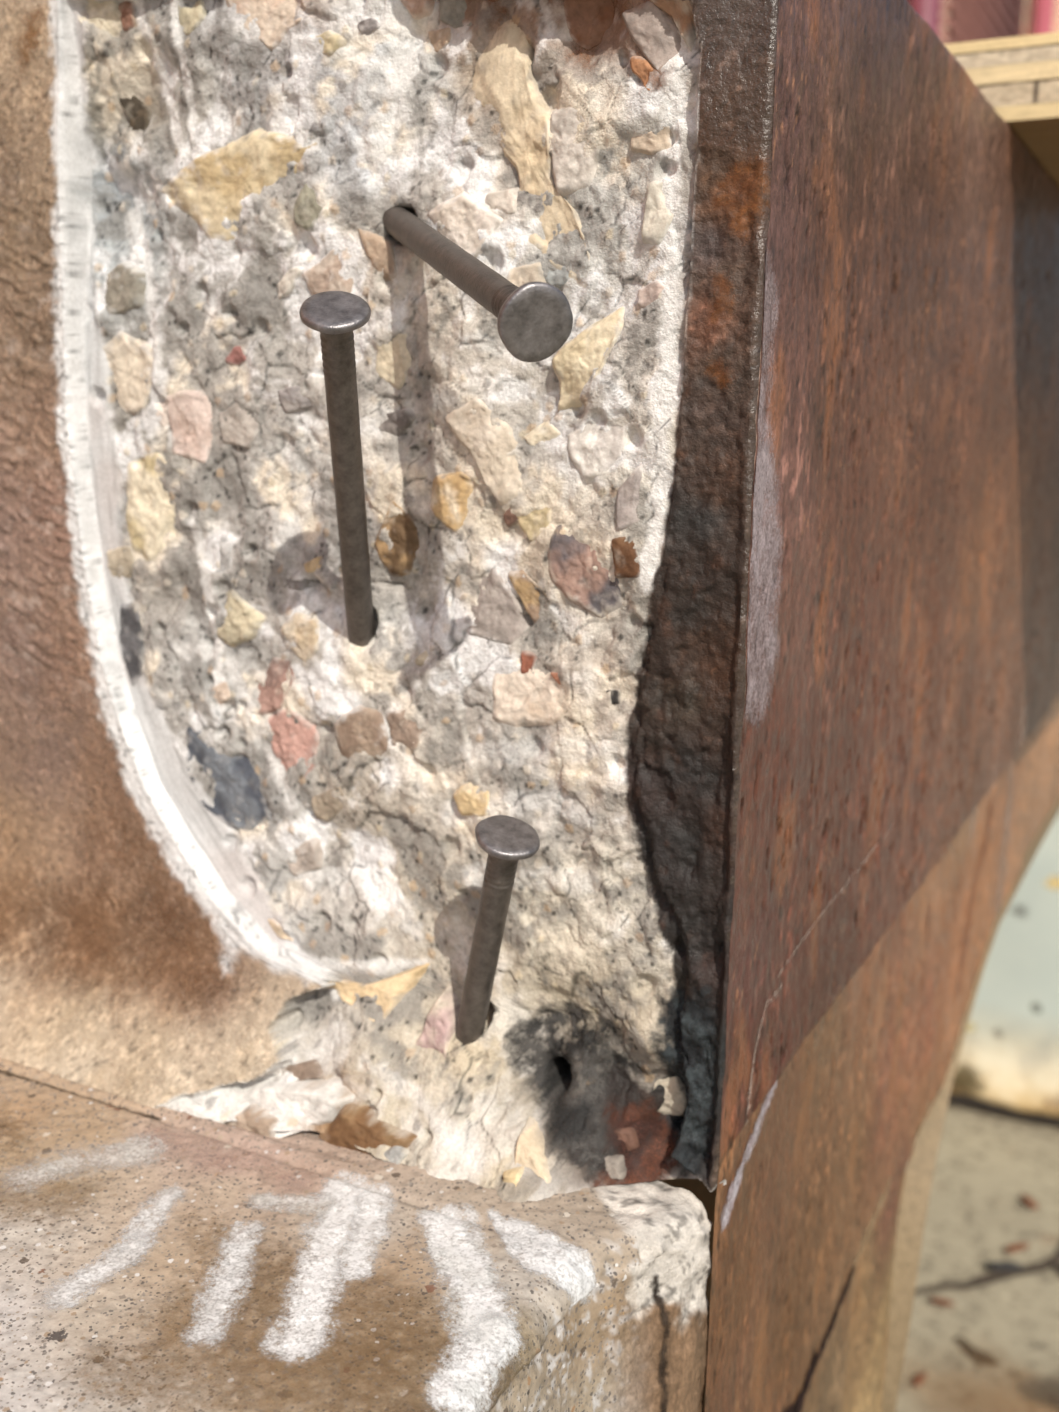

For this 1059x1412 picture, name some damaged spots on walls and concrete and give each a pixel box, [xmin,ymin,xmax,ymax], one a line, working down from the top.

spalling [78,0,726,1324]
corrosion [564,146,764,1188]
water stain [505,1002,645,1180]
water stain [652,990,717,1177]
crack [653,1276,670,1412]
crack [786,1267,855,1412]